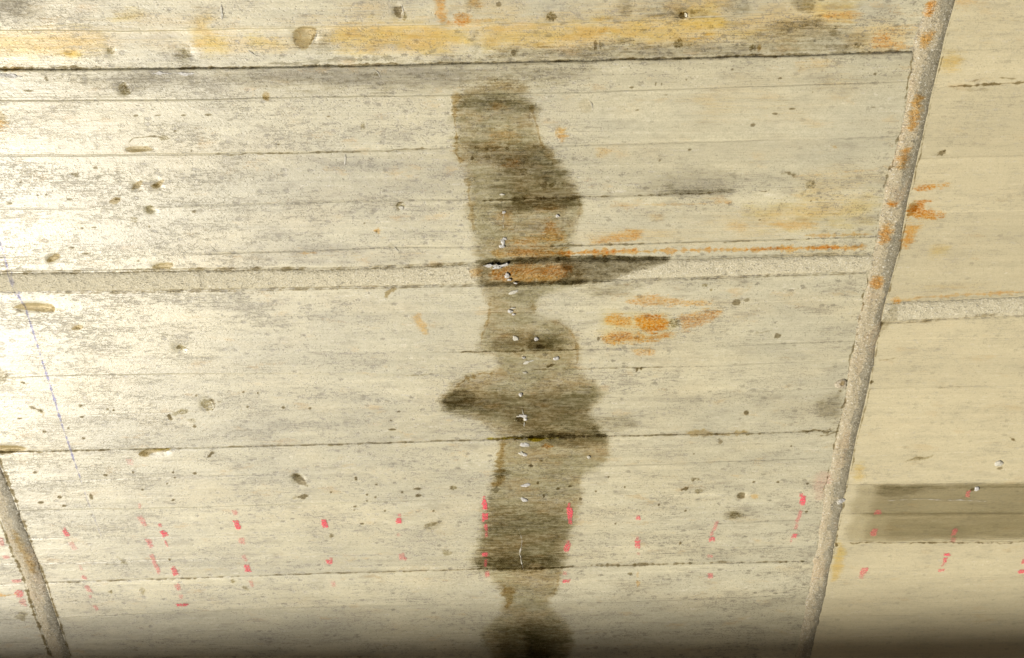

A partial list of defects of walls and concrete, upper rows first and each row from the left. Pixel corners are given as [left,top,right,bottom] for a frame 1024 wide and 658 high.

damp [485,258,529,316]
damp [553,255,666,282]